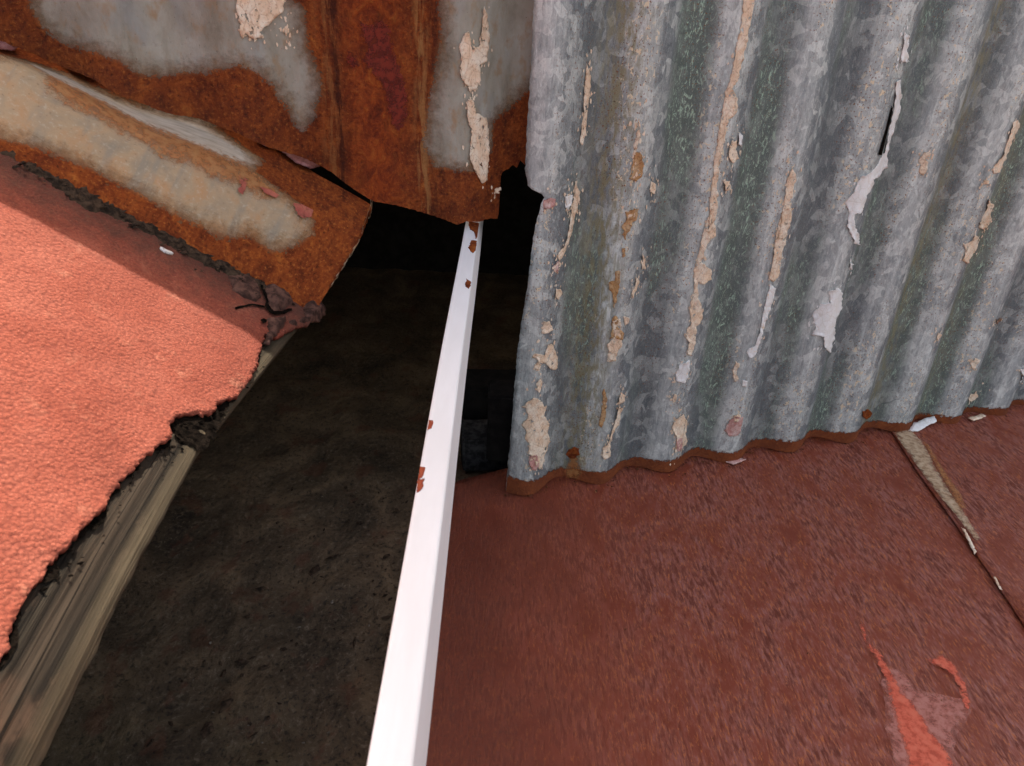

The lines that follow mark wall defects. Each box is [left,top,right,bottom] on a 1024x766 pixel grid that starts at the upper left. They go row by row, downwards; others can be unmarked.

corrosion [0,0,530,307]
peeling [459,8,501,202]
peeling [521,173,584,475]
peeling [577,49,595,145]
peeling [665,0,755,466]
peeling [732,151,802,387]
peeling [808,18,912,353]
crack [879,107,893,155]
peeling [955,118,1020,275]
corrosion [417,466,425,492]
corrosion [506,399,1024,540]
peeling [860,626,970,766]